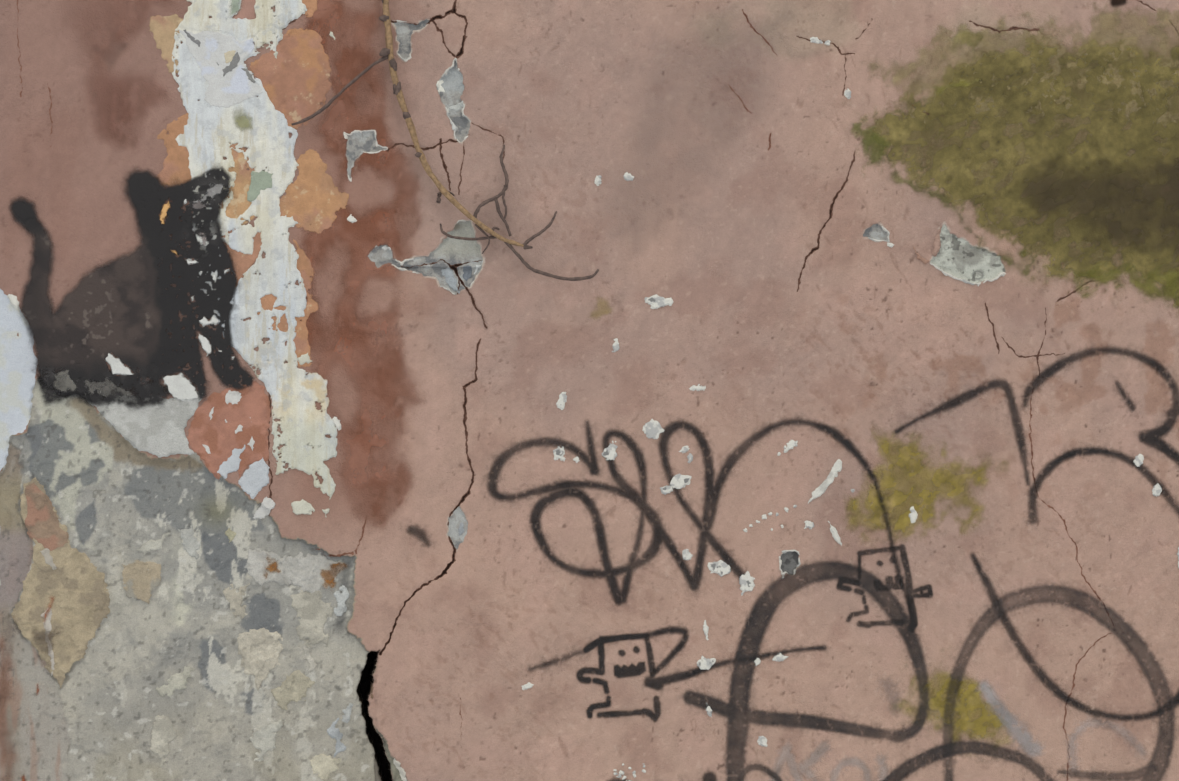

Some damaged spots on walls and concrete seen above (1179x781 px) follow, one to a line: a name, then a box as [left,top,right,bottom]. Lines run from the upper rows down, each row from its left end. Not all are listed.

flaking render [394,19,429,62]
crack [391,0,468,59]
flaking render [436,58,471,142]
crack [388,122,505,195]
flaking render [368,220,483,295]
crack [797,152,855,292]
flaking render [913,224,1006,286]
flaking render [0,0,388,781]
crack [357,259,487,781]
flaking render [448,506,468,550]
crack [985,280,1111,781]